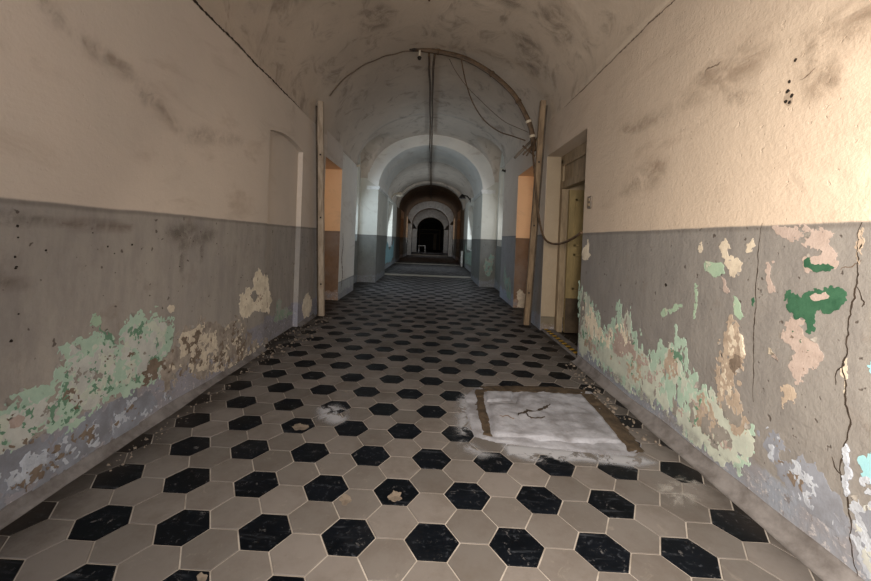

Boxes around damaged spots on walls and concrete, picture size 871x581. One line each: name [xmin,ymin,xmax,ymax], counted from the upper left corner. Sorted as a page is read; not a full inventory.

peeling [772,223,839,273]
spalling [17,451,72,492]
peeling [0,268,272,455]
peeling [578,238,756,477]
peeling [765,261,847,409]
crack [832,222,865,576]
spalling [848,450,871,579]